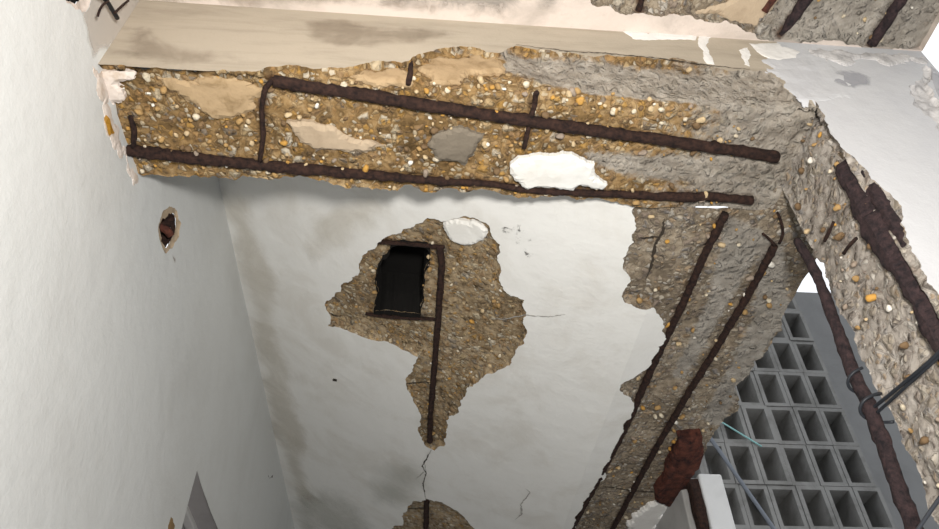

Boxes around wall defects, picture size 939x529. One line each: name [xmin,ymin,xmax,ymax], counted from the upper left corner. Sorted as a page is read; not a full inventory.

spalling [591,0,939,131]
spalling [92,46,939,398]
spalling [325,216,527,451]
spalling [572,190,816,529]
crack [417,451,431,499]
spalling [392,499,474,529]
rust [686,479,710,529]
spalling [850,371,921,529]
spalling [888,360,939,509]